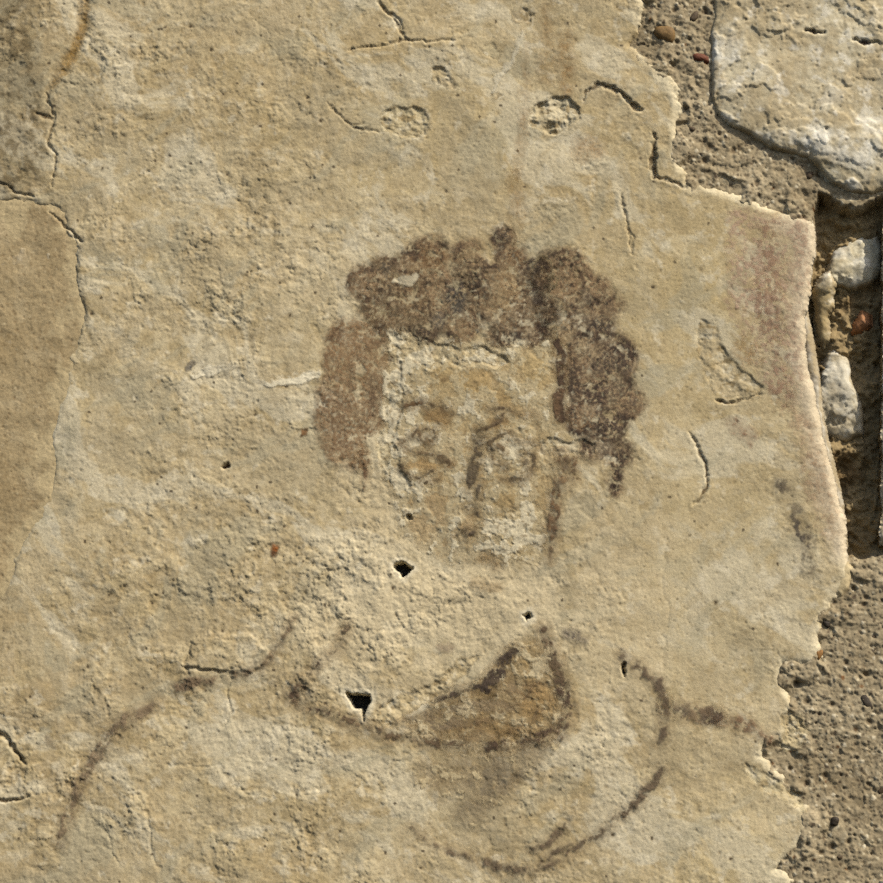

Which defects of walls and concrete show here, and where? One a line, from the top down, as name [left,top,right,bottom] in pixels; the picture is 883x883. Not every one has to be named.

spalling [693,53,709,64]
spalling [851,310,873,336]
spalling [697,319,761,400]
spalling [538,438,594,458]
spalling [781,712,809,752]
spalling [745,765,805,811]